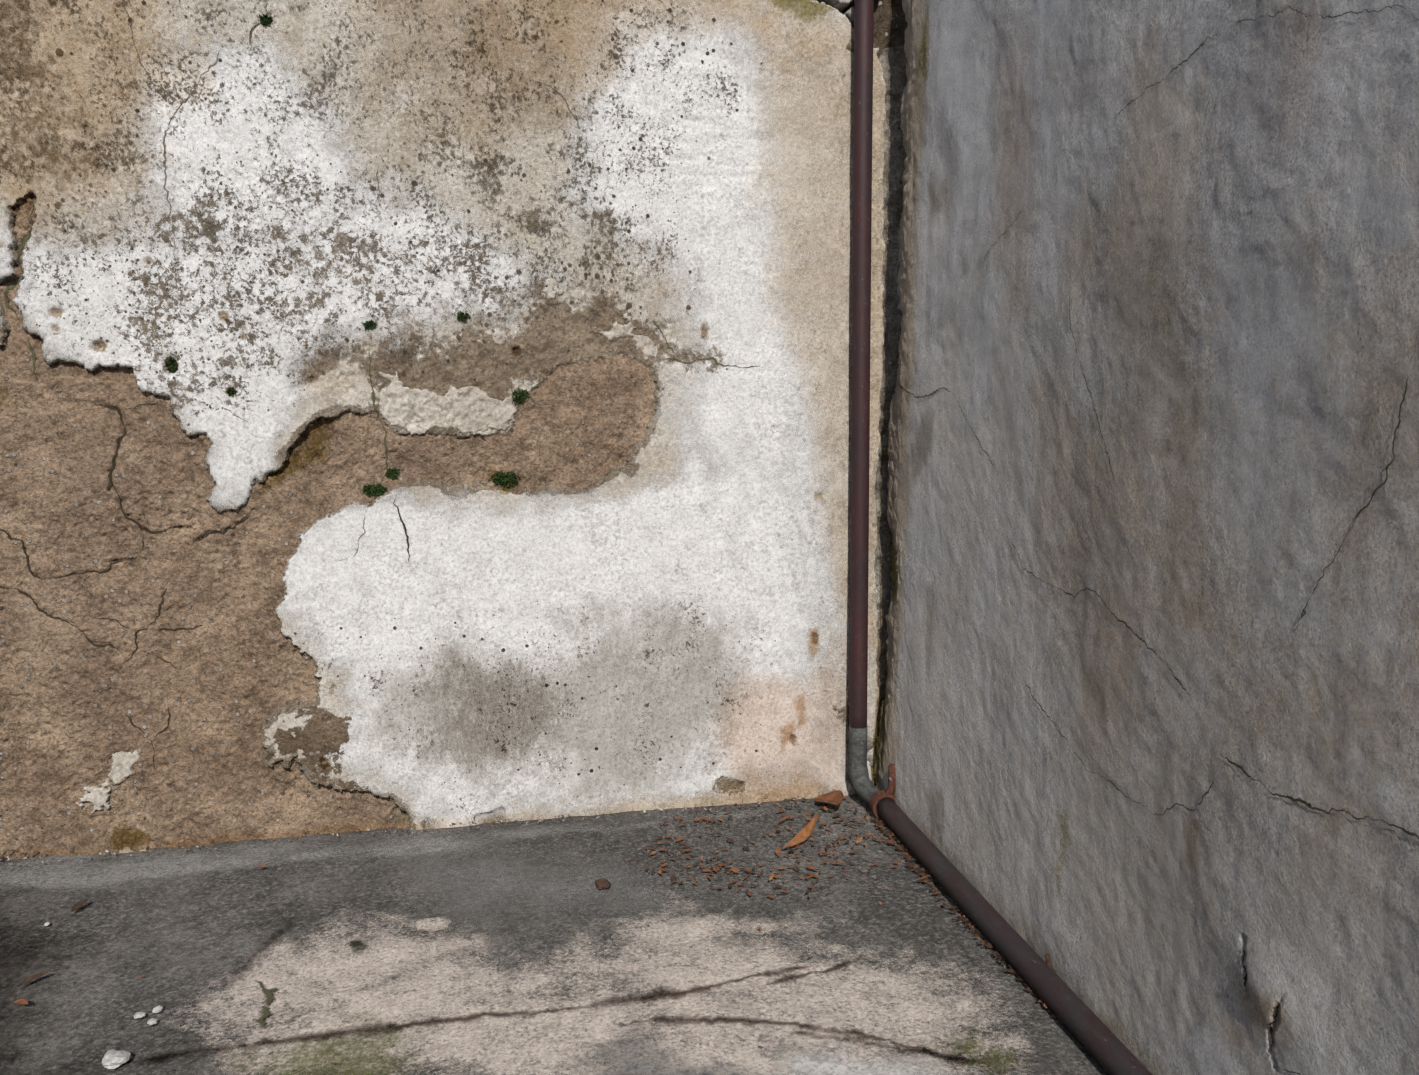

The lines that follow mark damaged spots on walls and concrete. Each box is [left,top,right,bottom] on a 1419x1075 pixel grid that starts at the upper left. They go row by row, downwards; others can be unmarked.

crack [125,3,268,291]
crack [1116,5,1418,116]
crack [0,403,251,669]
peeling [0,0,776,860]
water stain [0,0,853,890]
crack [653,320,763,368]
crack [1069,296,1124,530]
crack [1006,535,1190,695]
crack [1289,334,1419,640]
crack [1022,676,1419,839]